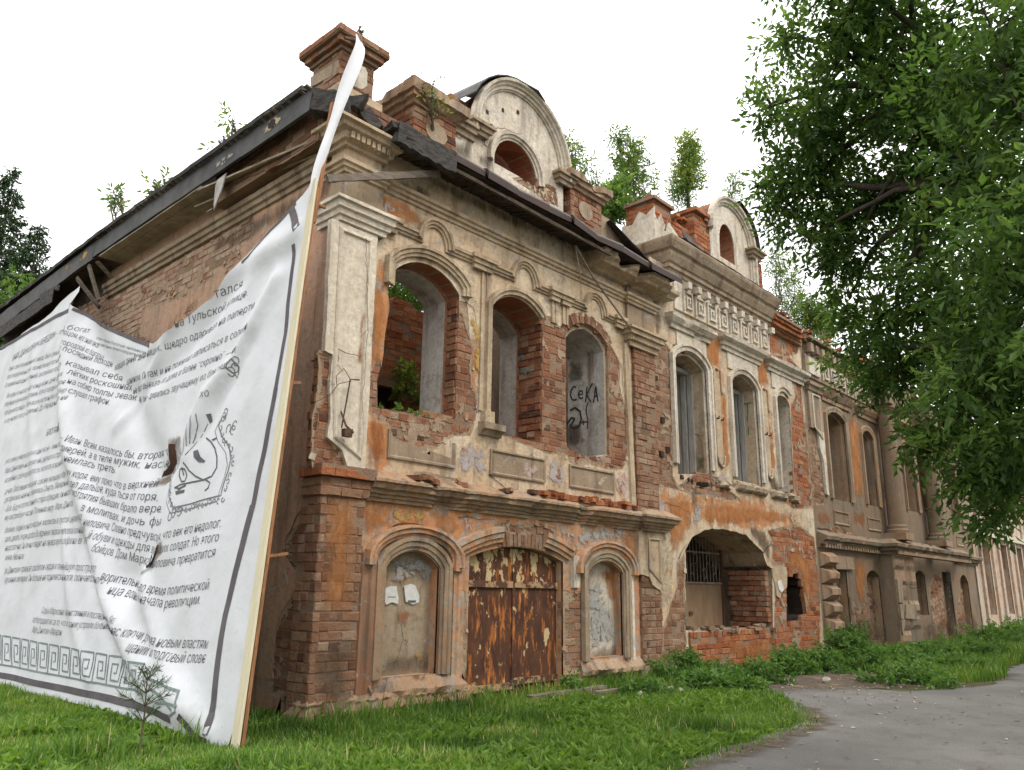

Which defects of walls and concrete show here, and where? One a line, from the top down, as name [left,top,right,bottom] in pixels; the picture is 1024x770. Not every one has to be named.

spalling [369,301,487,488]
spalling [463,518,627,547]
spalling [661,554,689,665]
spalling [768,526,820,653]